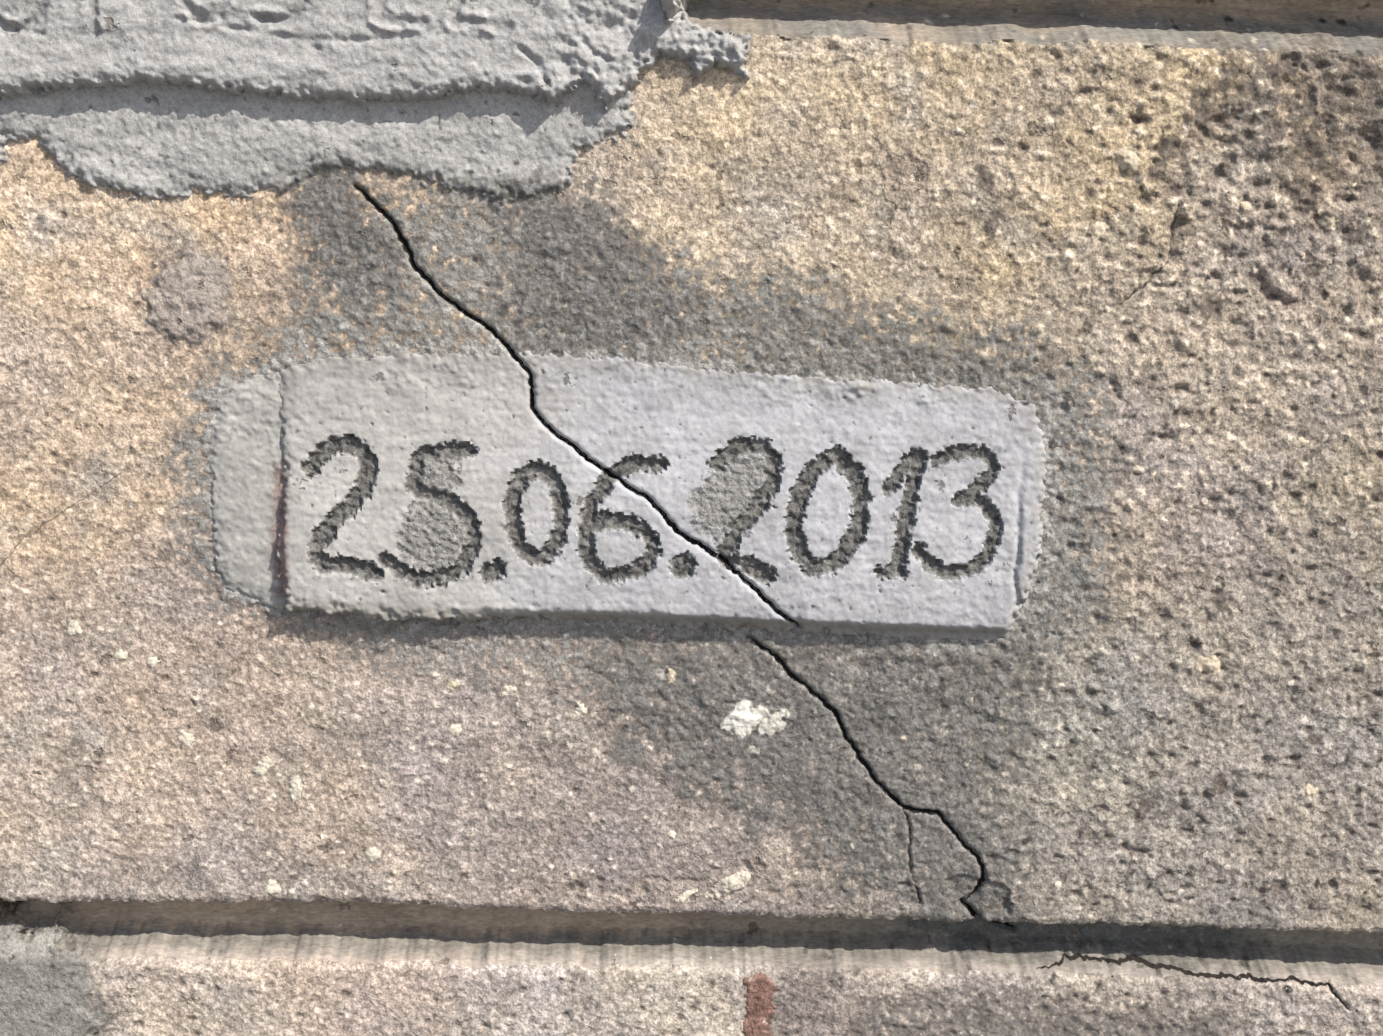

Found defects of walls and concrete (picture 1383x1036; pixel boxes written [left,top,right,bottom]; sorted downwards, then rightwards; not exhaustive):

crack [355,185,799,626]
crack [750,637,1013,927]
crack [1036,953,1348,1009]